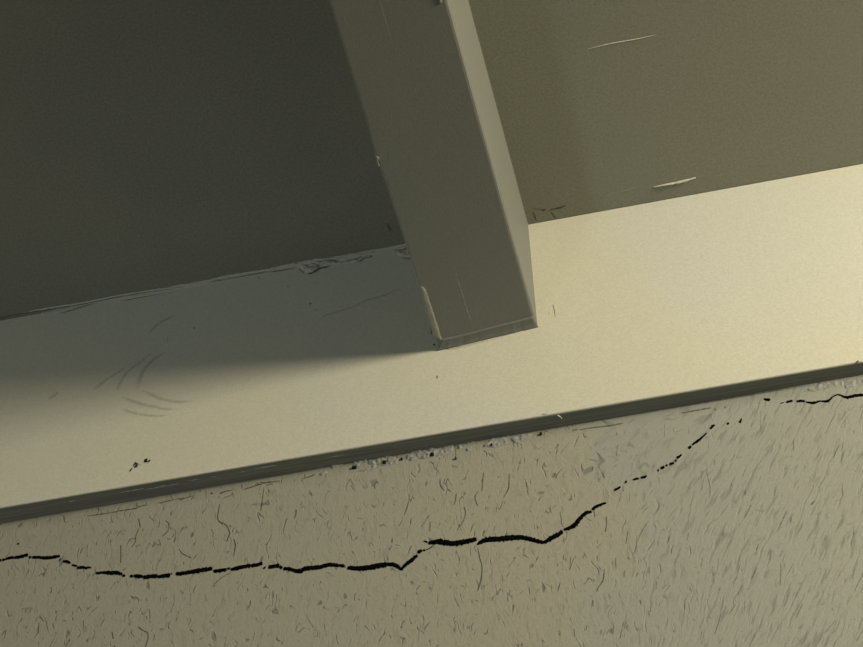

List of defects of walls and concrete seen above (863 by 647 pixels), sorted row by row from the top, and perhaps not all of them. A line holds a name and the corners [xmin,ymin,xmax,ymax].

crack [0,390,863,600]